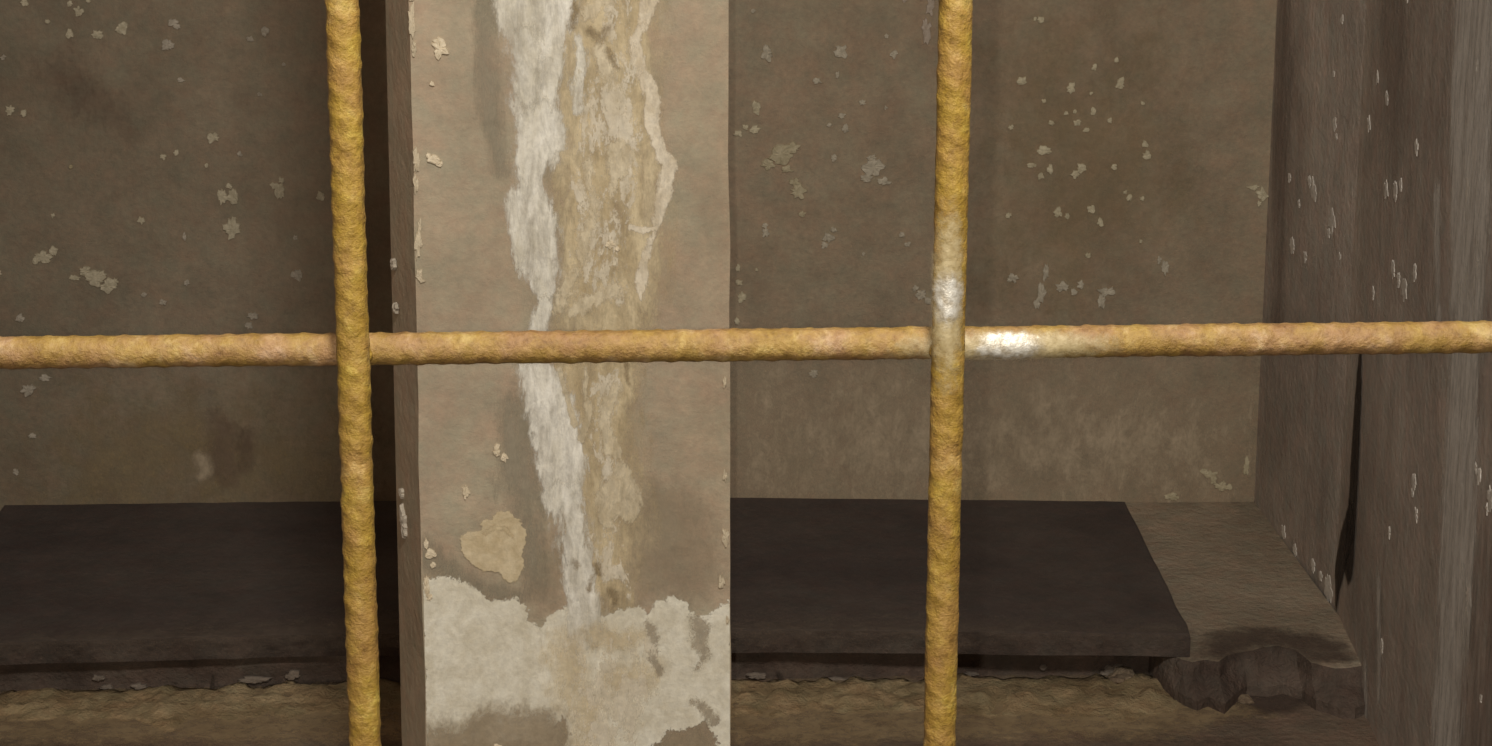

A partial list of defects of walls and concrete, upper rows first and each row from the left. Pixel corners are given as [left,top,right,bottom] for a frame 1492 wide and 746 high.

leakage [476,0,678,331]
flaking render [493,443,508,463]
crack [1335,354,1362,610]
flaking render [398,488,766,746]